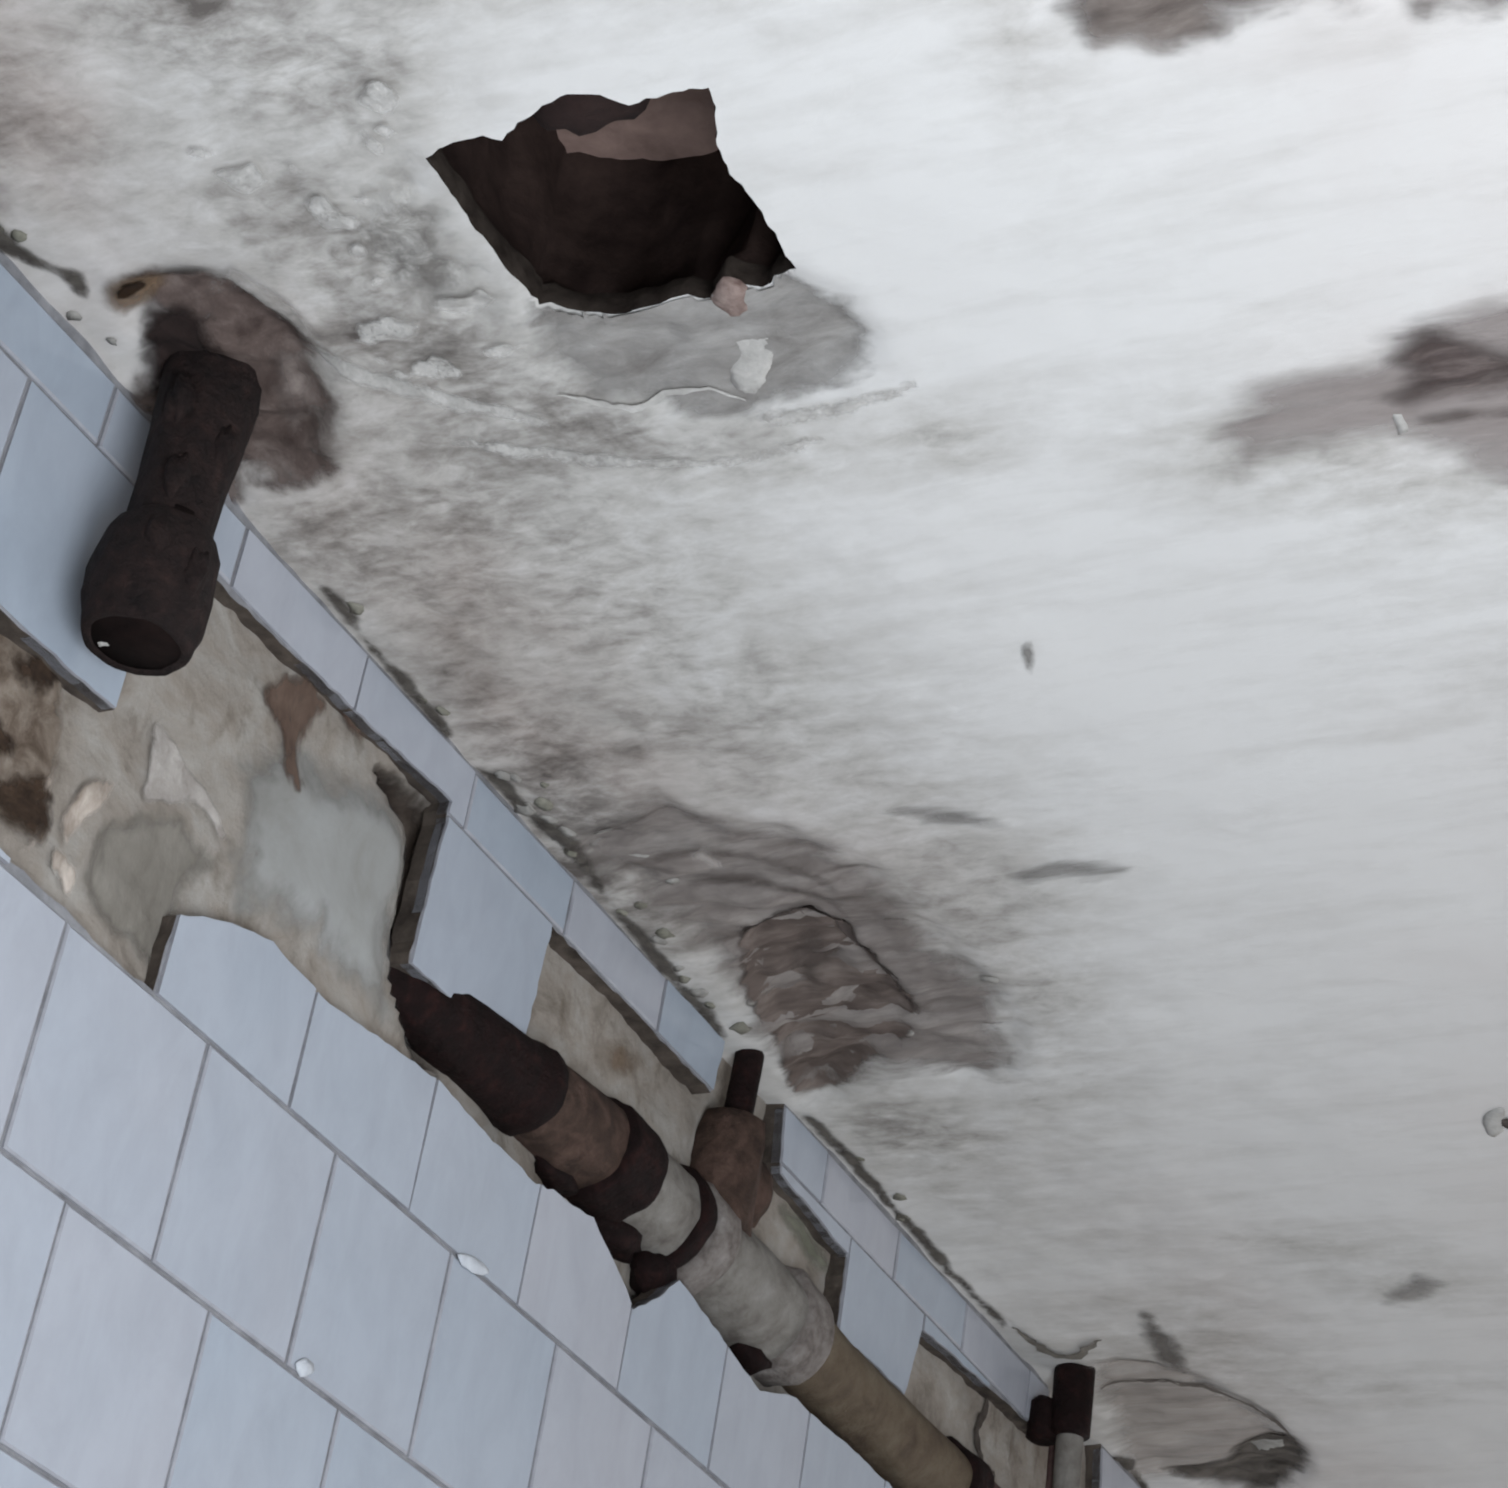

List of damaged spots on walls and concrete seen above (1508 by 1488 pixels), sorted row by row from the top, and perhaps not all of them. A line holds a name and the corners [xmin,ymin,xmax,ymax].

flaking render [361,82,398,153]
flaking render [309,187,494,312]
spalling [425,148,908,452]
water stain [1230,310,1508,472]
spalling [460,439,763,469]
spalling [51,725,225,959]
water stain [912,812,984,823]
water stain [1020,865,1117,879]
spalling [589,803,1002,1092]
crack [1483,1108,1508,1137]
spalling [1012,1327,1102,1360]
spalling [1101,1314,1307,1488]